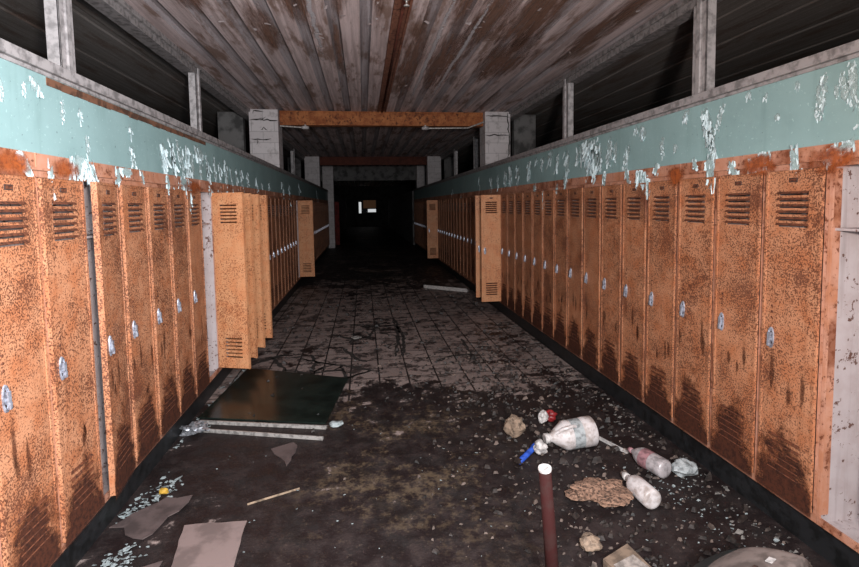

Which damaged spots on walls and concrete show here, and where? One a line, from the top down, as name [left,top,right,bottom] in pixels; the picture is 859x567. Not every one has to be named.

peeling [814,61,859,123]
rust [0,152,29,175]
rust [56,158,78,178]
spalling [21,76,301,214]
peeling [692,104,726,194]
peeling [728,161,767,175]
peeling [790,143,803,173]
rust [811,145,855,173]
peeling [826,124,859,170]
rust [115,354,210,498]
rust [501,273,811,517]
rust [12,425,105,567]